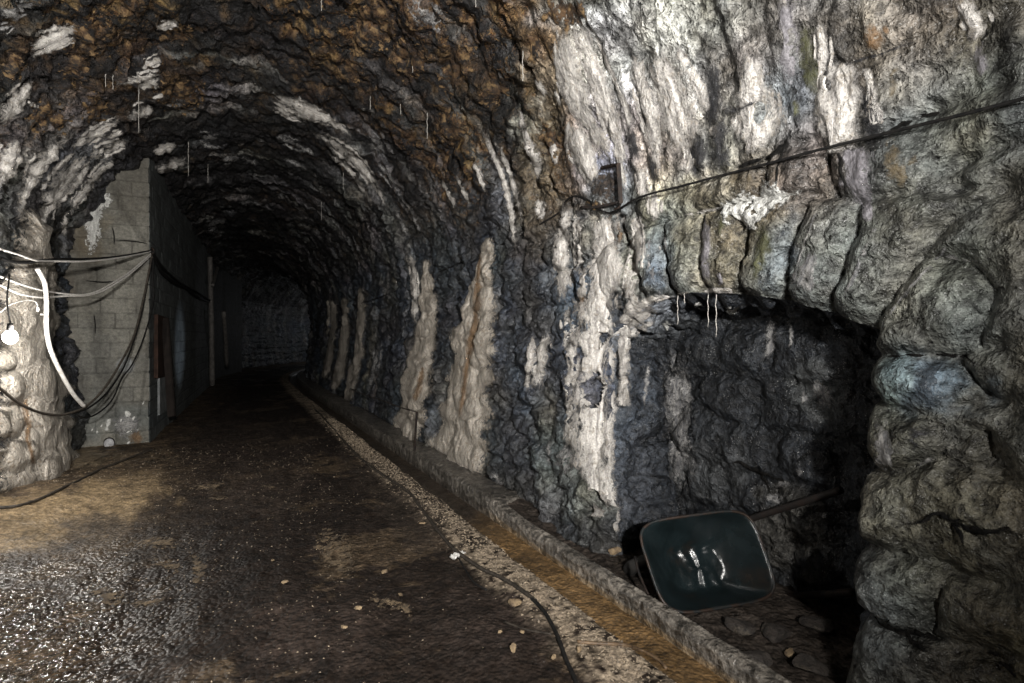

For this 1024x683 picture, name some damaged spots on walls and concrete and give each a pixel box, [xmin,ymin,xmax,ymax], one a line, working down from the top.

leakage [156,19,179,31]
leakage [0,53,163,255]
leakage [407,255,420,323]
rust [459,258,481,414]
leakage [520,28,803,532]